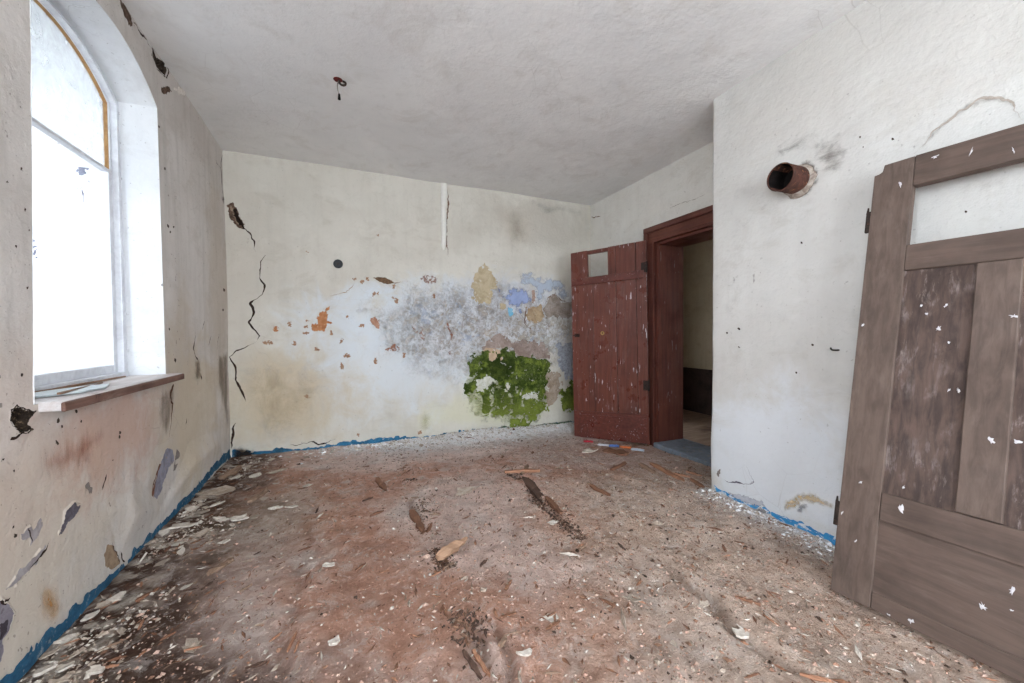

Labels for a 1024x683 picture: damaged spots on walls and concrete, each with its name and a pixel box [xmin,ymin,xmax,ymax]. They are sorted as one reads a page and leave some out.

spalling [352,276,399,304]
spalling [471,263,506,310]
crack [169,229,266,448]
spalling [262,306,351,369]
spalling [346,315,381,329]
spalling [481,290,573,407]
spalling [9,404,36,440]
peeling [152,448,180,500]
peeling [13,517,43,547]
peeling [58,500,81,536]
spalling [103,544,120,571]
peeling [0,596,16,663]